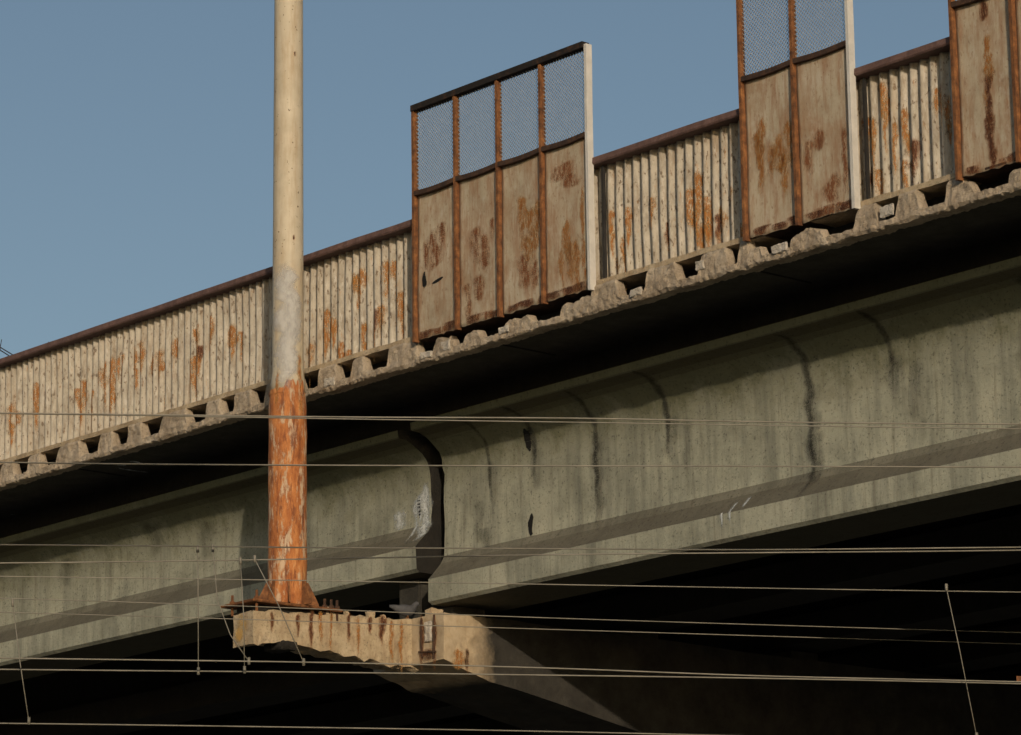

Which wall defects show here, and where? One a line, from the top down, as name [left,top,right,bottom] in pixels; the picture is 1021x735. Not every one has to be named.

rust [424,222,445,268]
rust [464,162,586,324]
rust [609,208,633,273]
rust [685,172,732,248]
rust [740,119,852,238]
rust [862,82,920,194]
rust [983,37,1016,169]
rust [74,339,178,429]
rust [190,316,214,395]
rust [228,325,243,359]
rust [270,260,404,410]
spalling [418,615,437,658]